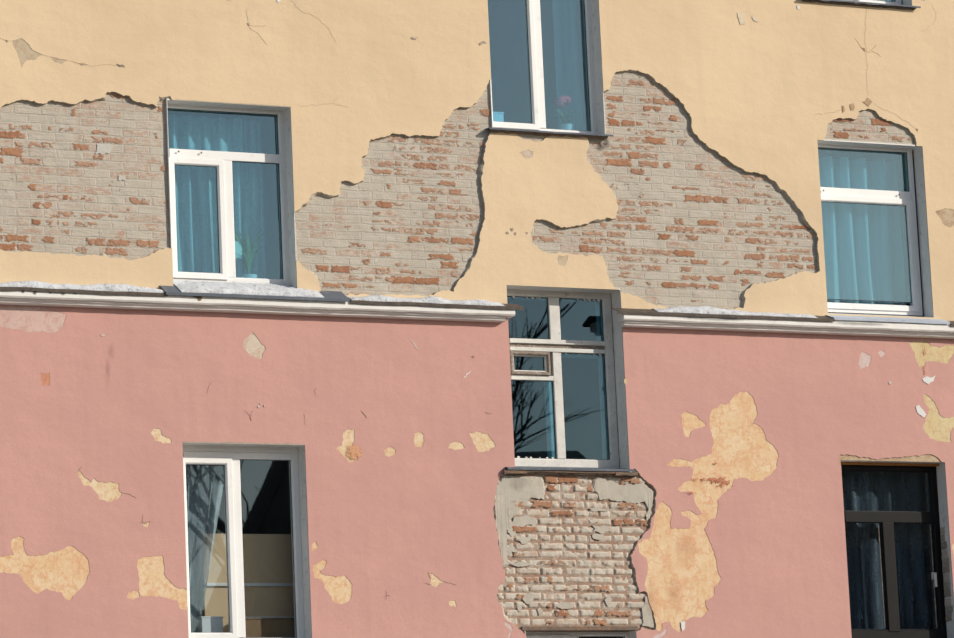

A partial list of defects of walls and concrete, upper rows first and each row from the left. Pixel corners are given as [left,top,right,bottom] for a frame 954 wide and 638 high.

spalling [824,98,918,145]
spalling [0,92,172,261]
spalling [295,83,491,296]
spalling [506,70,820,309]
peeling [910,341,954,367]
peeling [77,471,122,502]
spalling [493,391,779,638]
peeling [839,454,941,465]
peeling [0,536,90,600]
peeling [127,556,188,610]
peeling [313,560,352,604]
spalling [940,527,954,622]